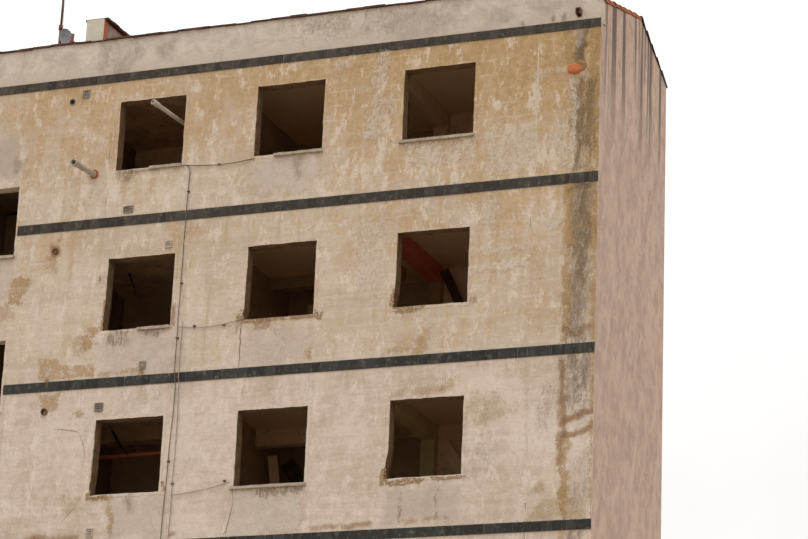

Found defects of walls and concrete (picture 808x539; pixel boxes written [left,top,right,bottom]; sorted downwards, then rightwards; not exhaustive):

leakage [554,26,601,171]
rust [560,181,574,341]
peeling [9,276,30,305]
spalling [236,309,323,323]
peeling [38,359,94,380]
spalling [379,468,465,487]
rust [556,409,593,519]